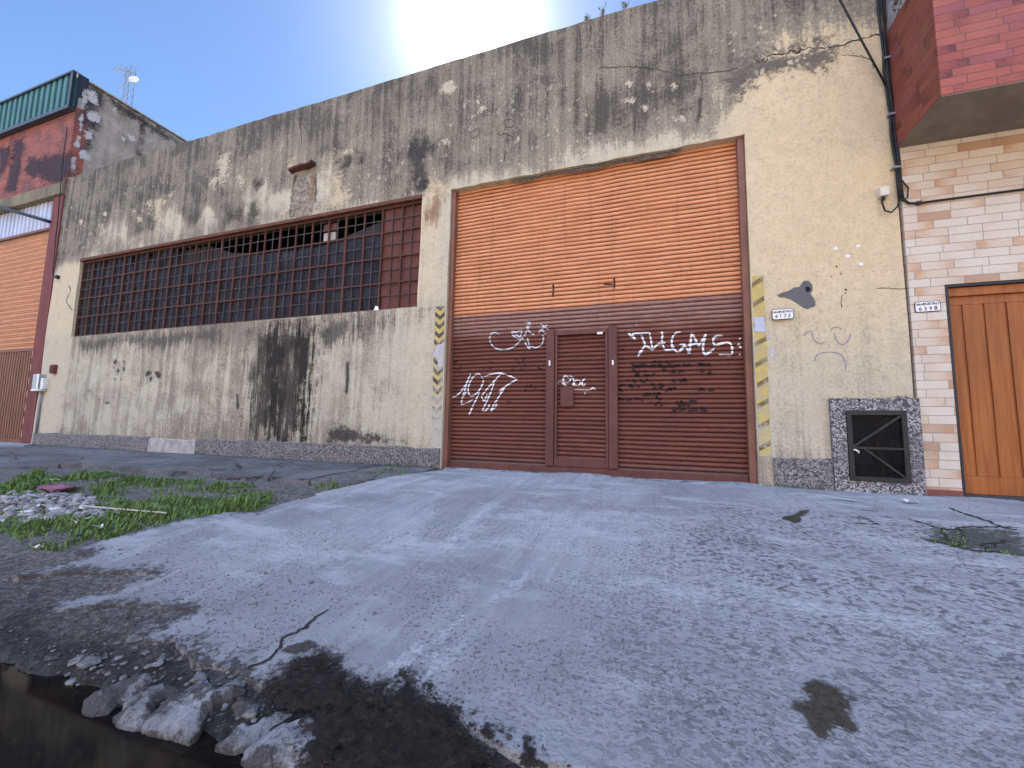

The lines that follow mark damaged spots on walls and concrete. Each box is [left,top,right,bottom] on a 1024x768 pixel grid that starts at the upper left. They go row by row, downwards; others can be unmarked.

crack [598,33,880,77]
water stain [0,139,71,196]
peeling [70,88,101,173]
water stain [236,311,409,444]